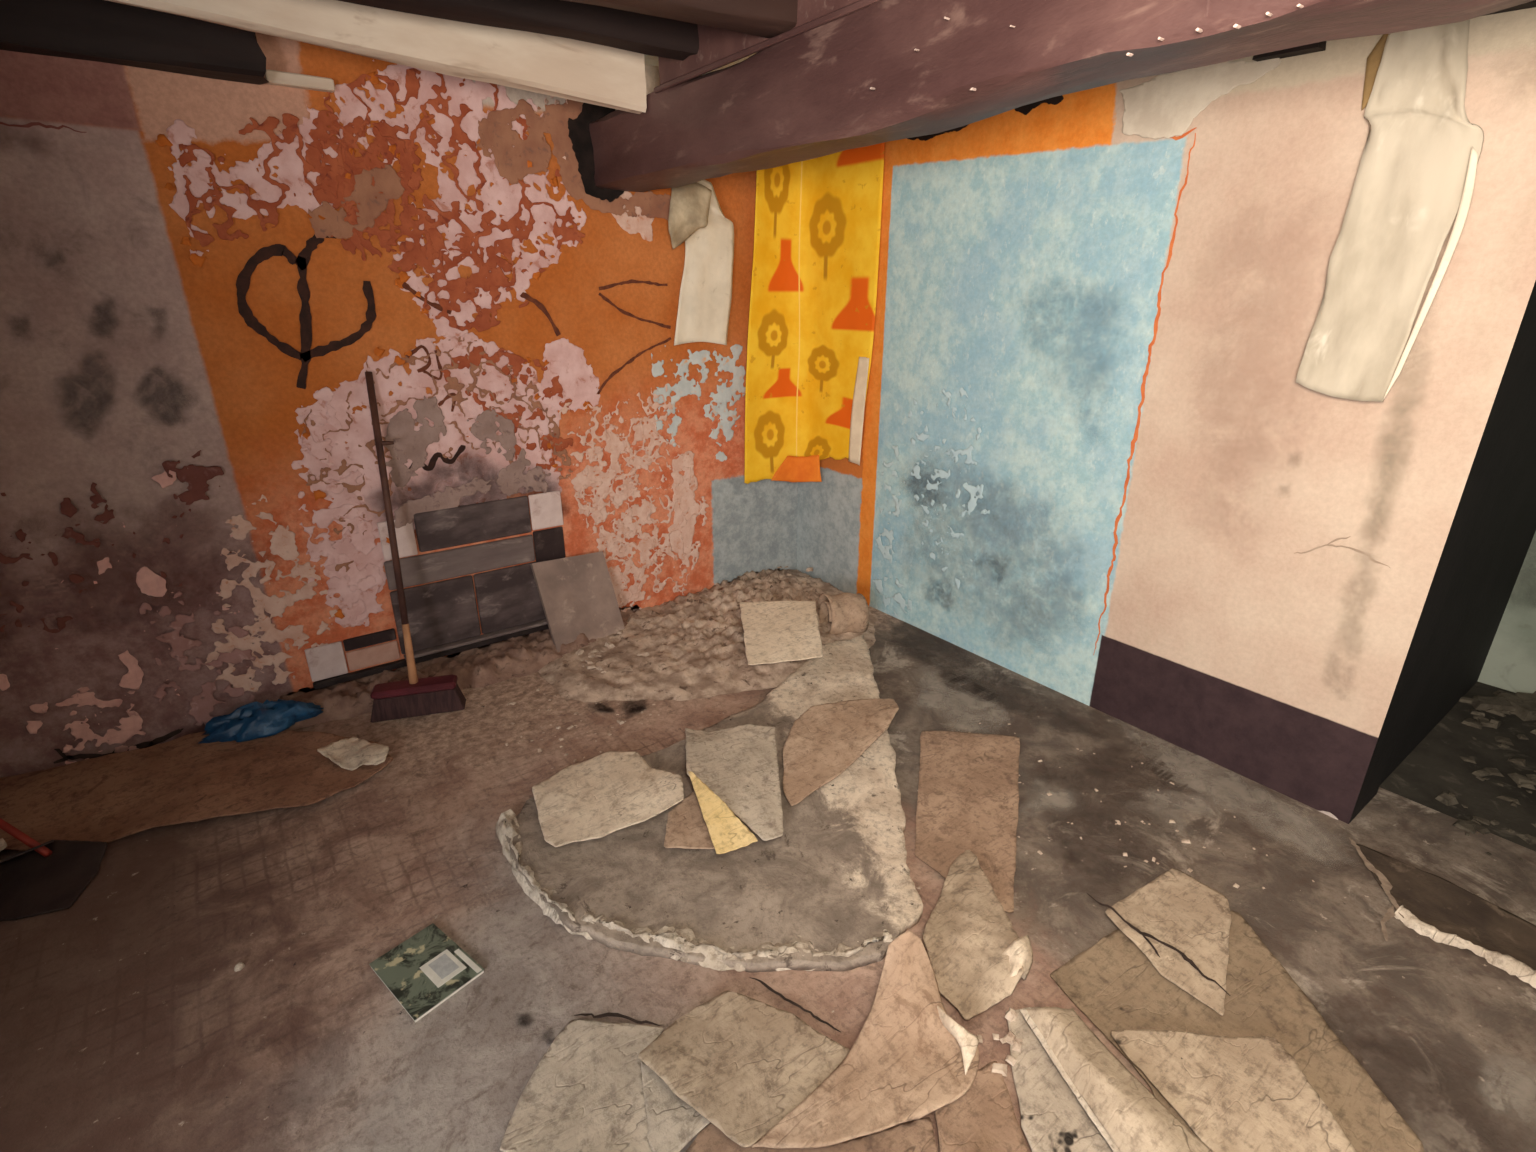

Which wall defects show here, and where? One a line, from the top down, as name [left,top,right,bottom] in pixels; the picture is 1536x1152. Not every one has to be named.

peeling [152,59,746,628]
flaking render [0,482,182,612]
peeling [0,674,10,691]
peeling [26,650,146,765]